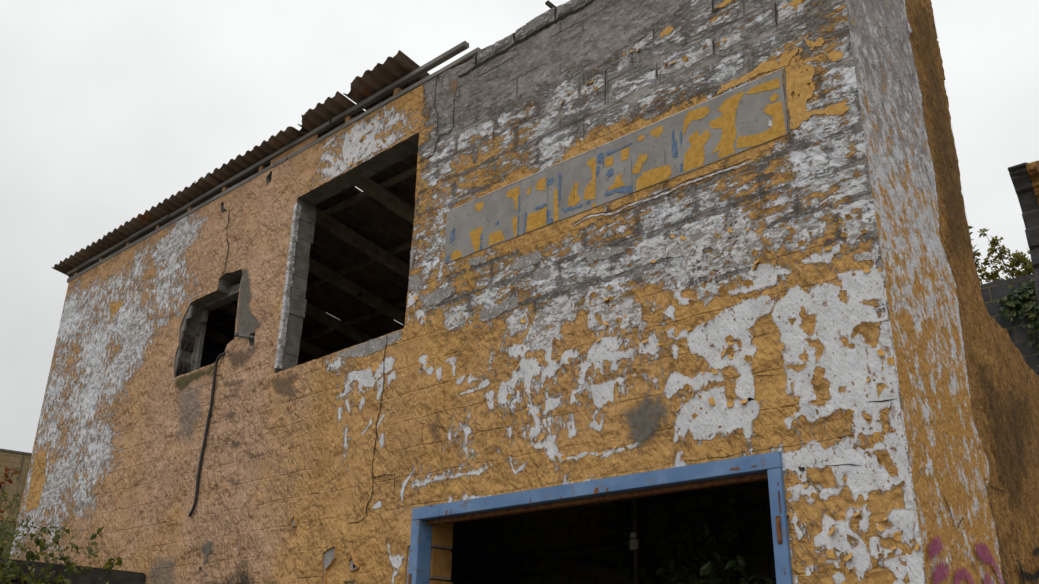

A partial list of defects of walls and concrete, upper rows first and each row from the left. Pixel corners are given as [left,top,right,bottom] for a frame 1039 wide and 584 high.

peeling [613,32,653,60]
peeling [657,33,741,75]
peeling [543,78,604,113]
peeling [321,115,400,179]
crack [572,158,753,226]
peeling [407,248,464,332]
peeling [39,464,75,506]
peeling [326,331,402,452]
crack [348,340,395,524]
peeling [400,426,492,502]
water stain [625,395,667,446]
peeling [419,214,926,584]